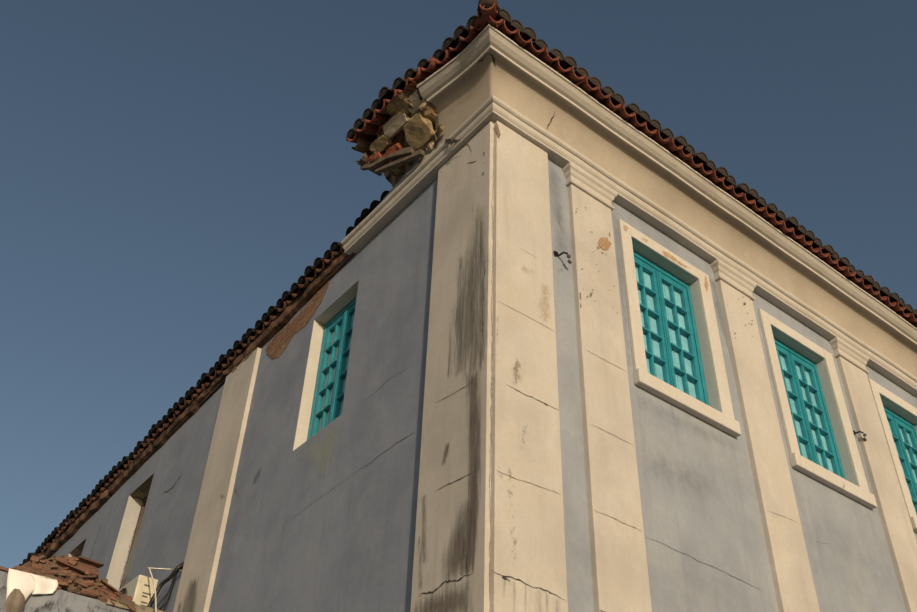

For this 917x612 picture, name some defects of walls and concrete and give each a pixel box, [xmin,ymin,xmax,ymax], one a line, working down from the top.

flaking render [368,80,444,187]
flaking render [231,280,330,372]
damp [459,228,483,364]
crack [421,134,564,612]
damp [420,375,480,612]